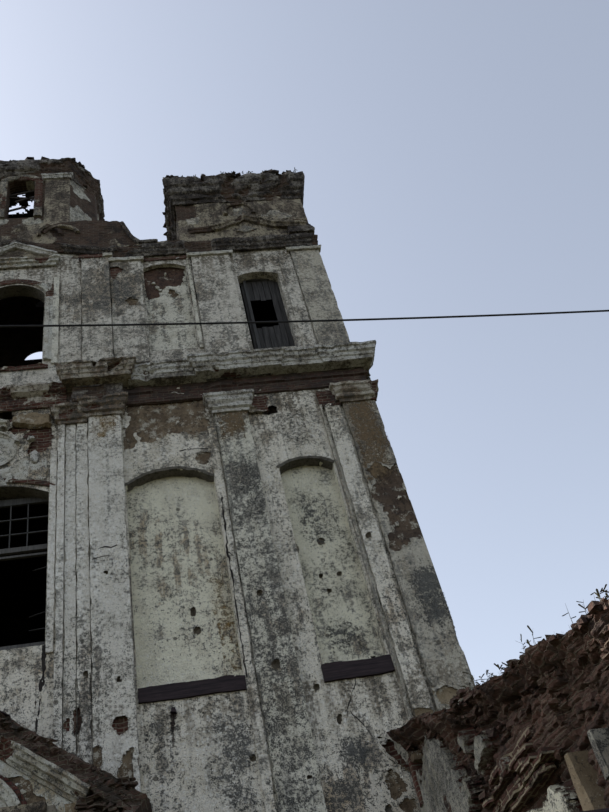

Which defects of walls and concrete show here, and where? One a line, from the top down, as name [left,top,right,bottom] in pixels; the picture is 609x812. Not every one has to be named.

spalling [123,264,187,306]
spalling [0,412,56,456]
flaking render [363,452,424,554]
crack [221,497,248,678]
damp [407,558,455,632]
spalling [412,683,463,717]
flaking render [372,727,500,812]
flaking render [528,781,583,812]